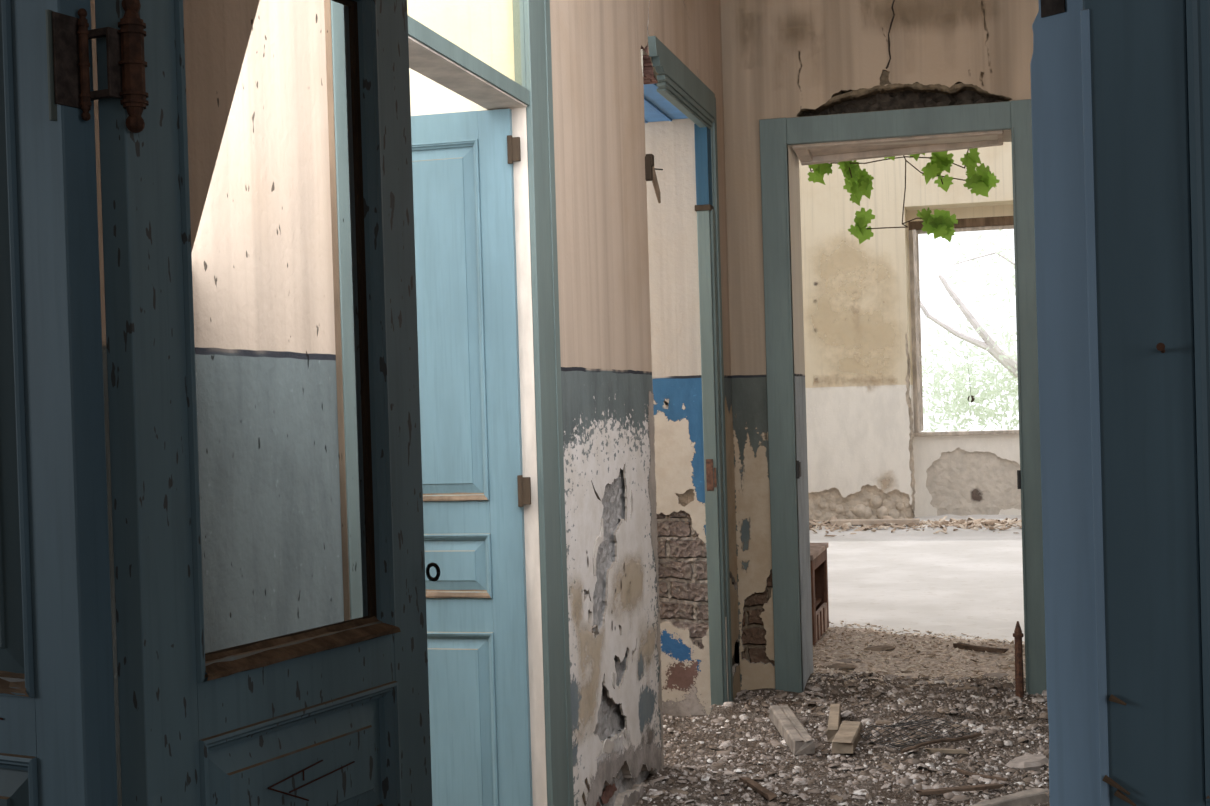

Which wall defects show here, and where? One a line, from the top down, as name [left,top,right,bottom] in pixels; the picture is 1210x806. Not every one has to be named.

crack [882,0,895,69]
spalling [796,69,1012,117]
spalling [808,484,915,521]
spalling [926,447,1021,516]
peeling [725,396,775,699]
peeling [563,385,711,806]